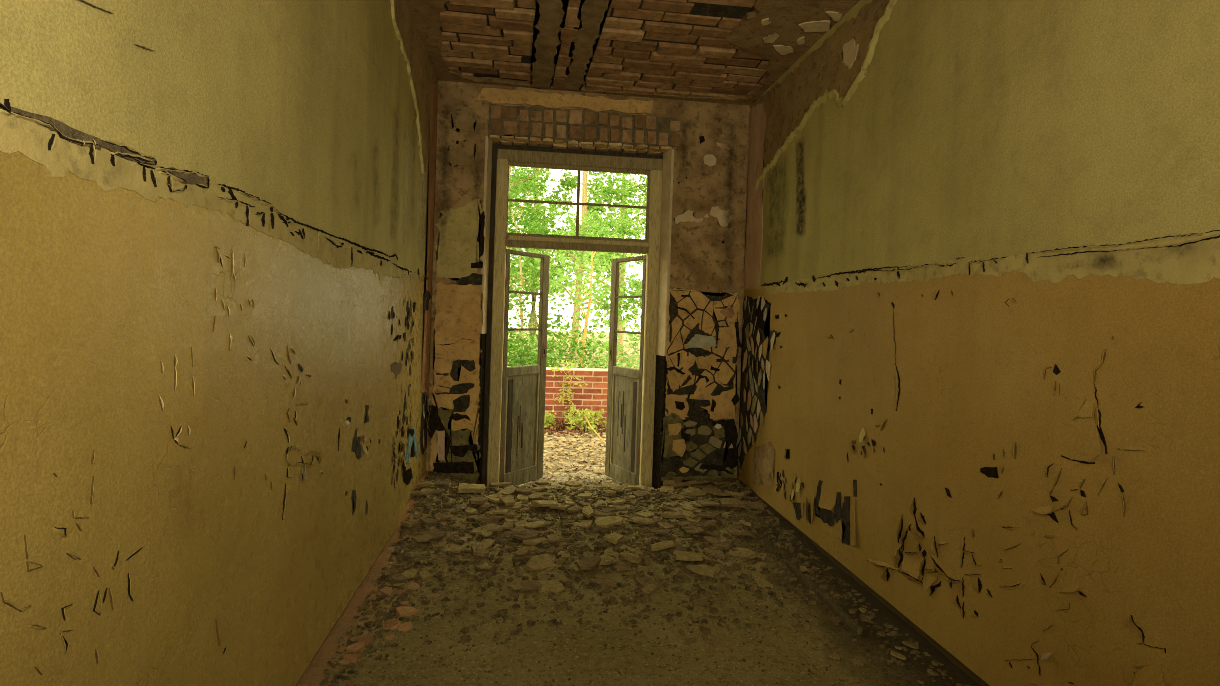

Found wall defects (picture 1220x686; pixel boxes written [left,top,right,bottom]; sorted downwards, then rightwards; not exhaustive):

peeling [0,0,536,488]
peeling [345,490,368,515]
peeling [901,530,939,592]
peeling [660,229,1220,545]